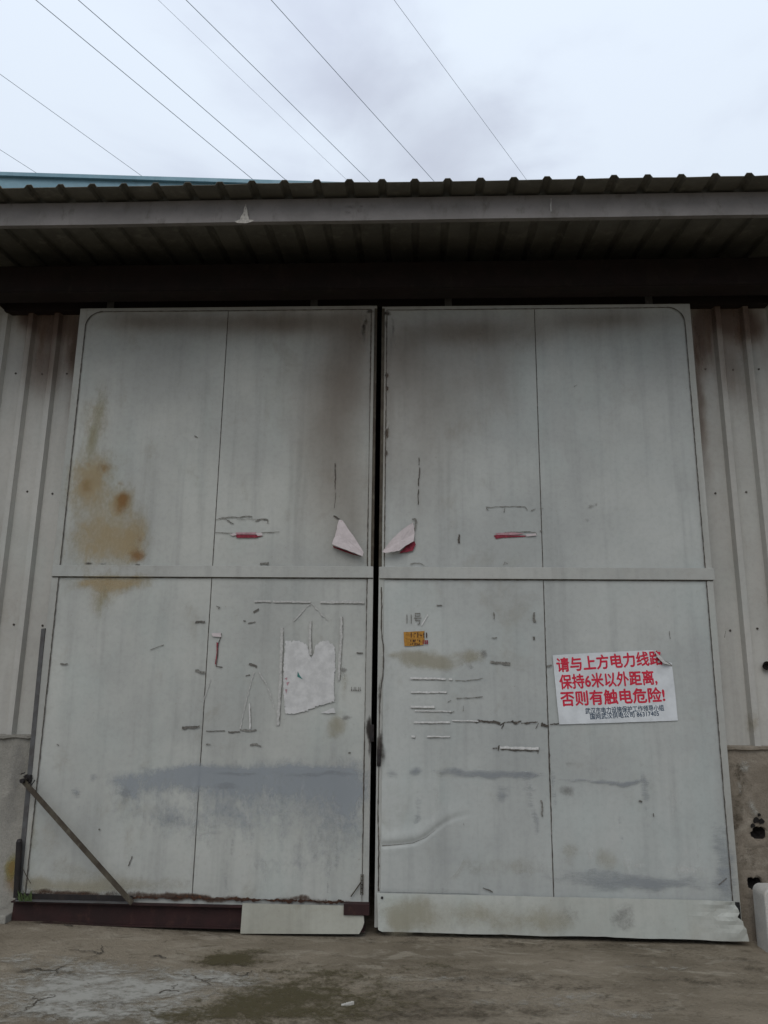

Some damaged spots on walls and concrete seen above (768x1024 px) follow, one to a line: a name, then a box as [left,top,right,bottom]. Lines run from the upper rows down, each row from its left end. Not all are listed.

spalling [742,813,768,848]
rust [129,892,347,904]
spalling [740,870,768,899]